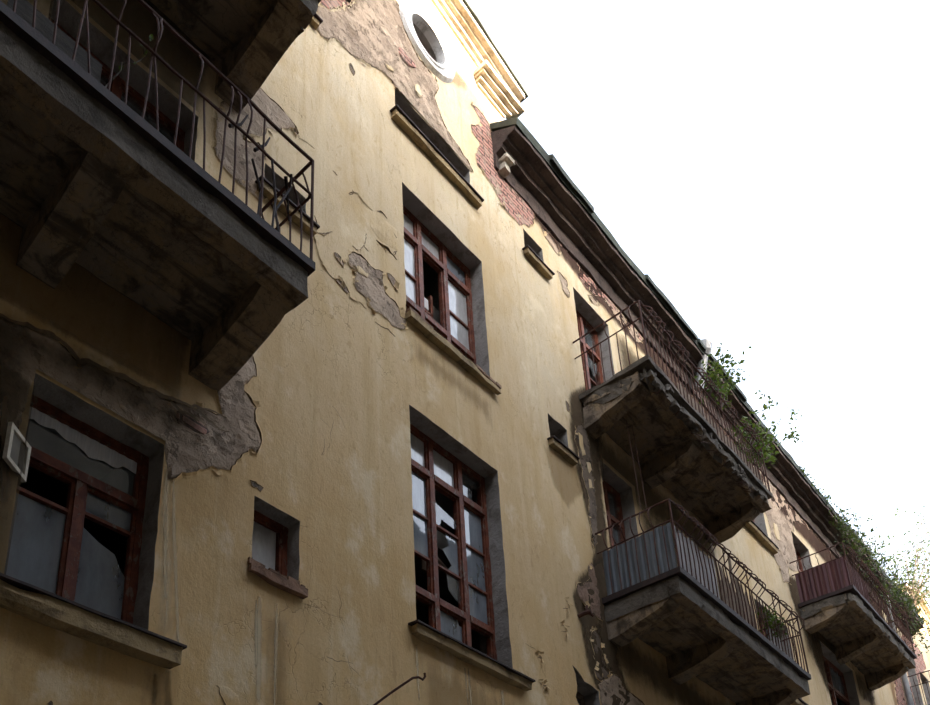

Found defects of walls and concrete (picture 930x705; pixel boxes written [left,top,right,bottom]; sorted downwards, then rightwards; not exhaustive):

peeling [211,87,301,204]
peeling [316,0,568,257]
crack [333,171,397,260]
crack [313,215,395,336]
peeling [333,248,408,332]
peeling [557,271,570,299]
peeling [577,262,644,344]
peeling [0,316,263,484]
peeling [575,425,601,550]
peeling [753,466,831,584]
peeling [560,561,645,705]